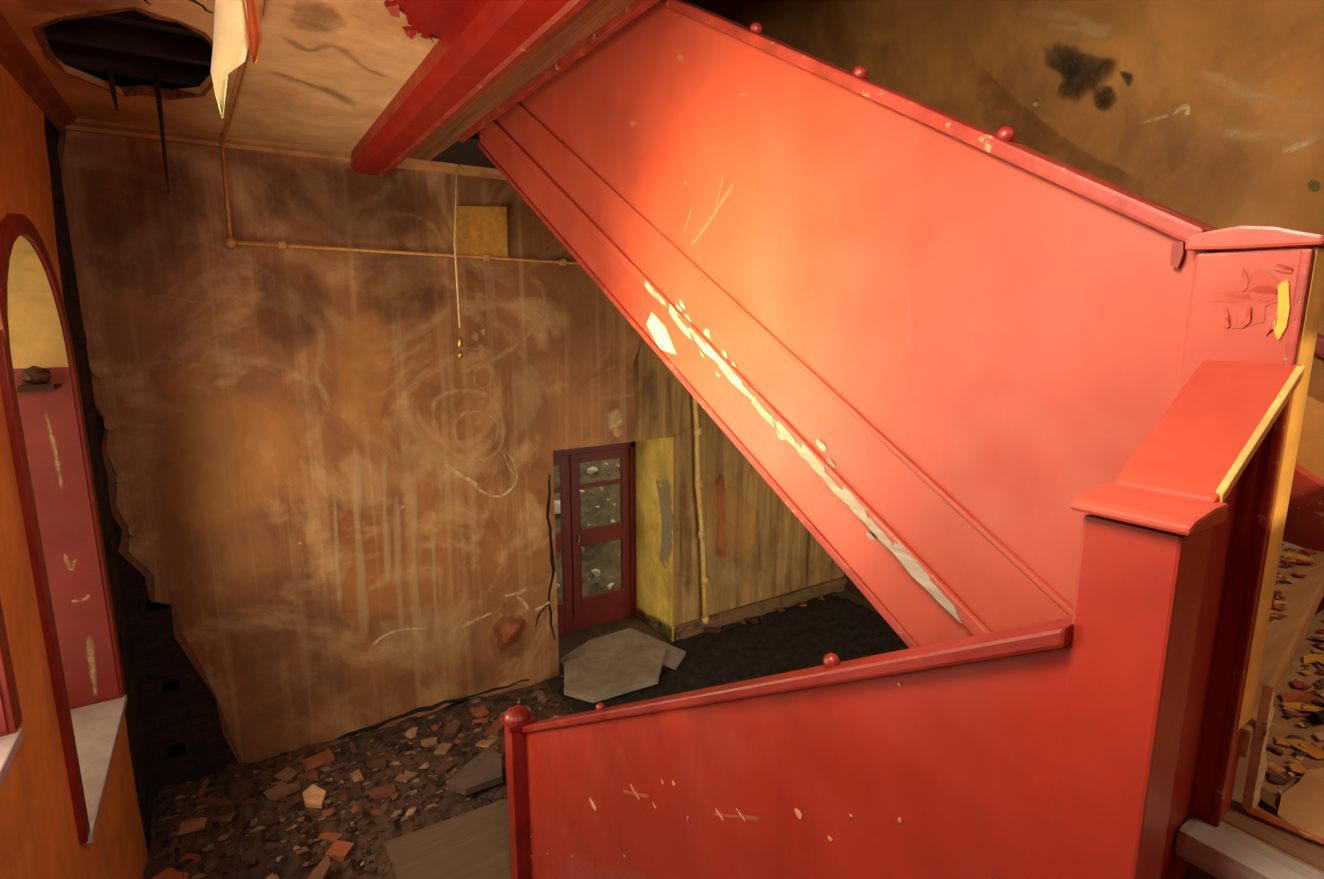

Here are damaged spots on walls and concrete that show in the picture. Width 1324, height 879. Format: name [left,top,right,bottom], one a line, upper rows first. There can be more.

peeling [211,0,262,118]
peeling [384,0,471,43]
water stain [1049,48,1132,109]
peeling [645,281,962,623]